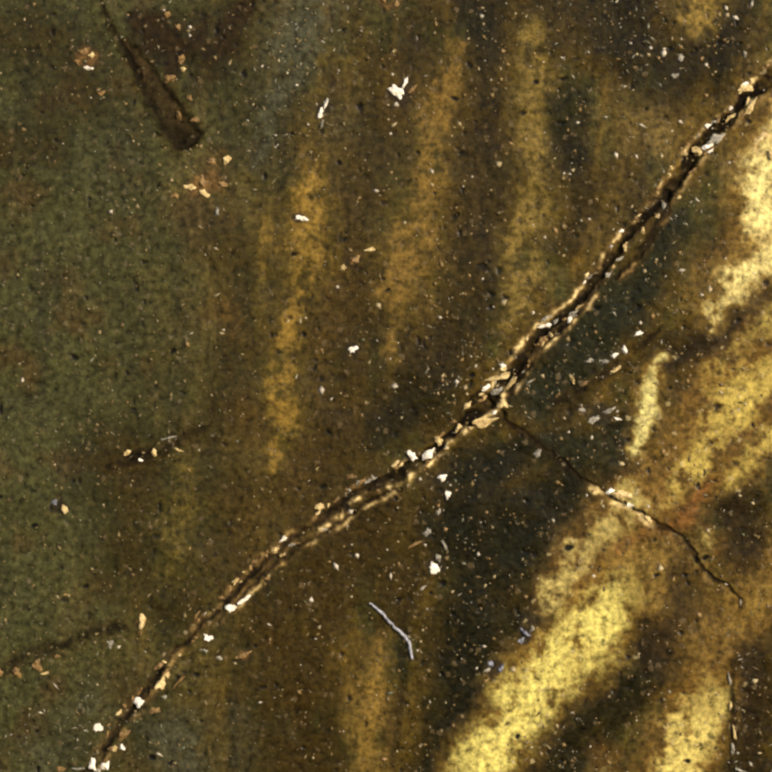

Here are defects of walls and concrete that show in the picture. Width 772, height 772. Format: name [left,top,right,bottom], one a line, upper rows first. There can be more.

water stain [635,0,768,115]
crack [435,54,772,446]
water stain [0,659,124,772]
water stain [60,325,225,659]
crack [72,423,480,772]
water stain [114,75,772,772]
crack [501,415,744,602]
crack [721,654,744,772]